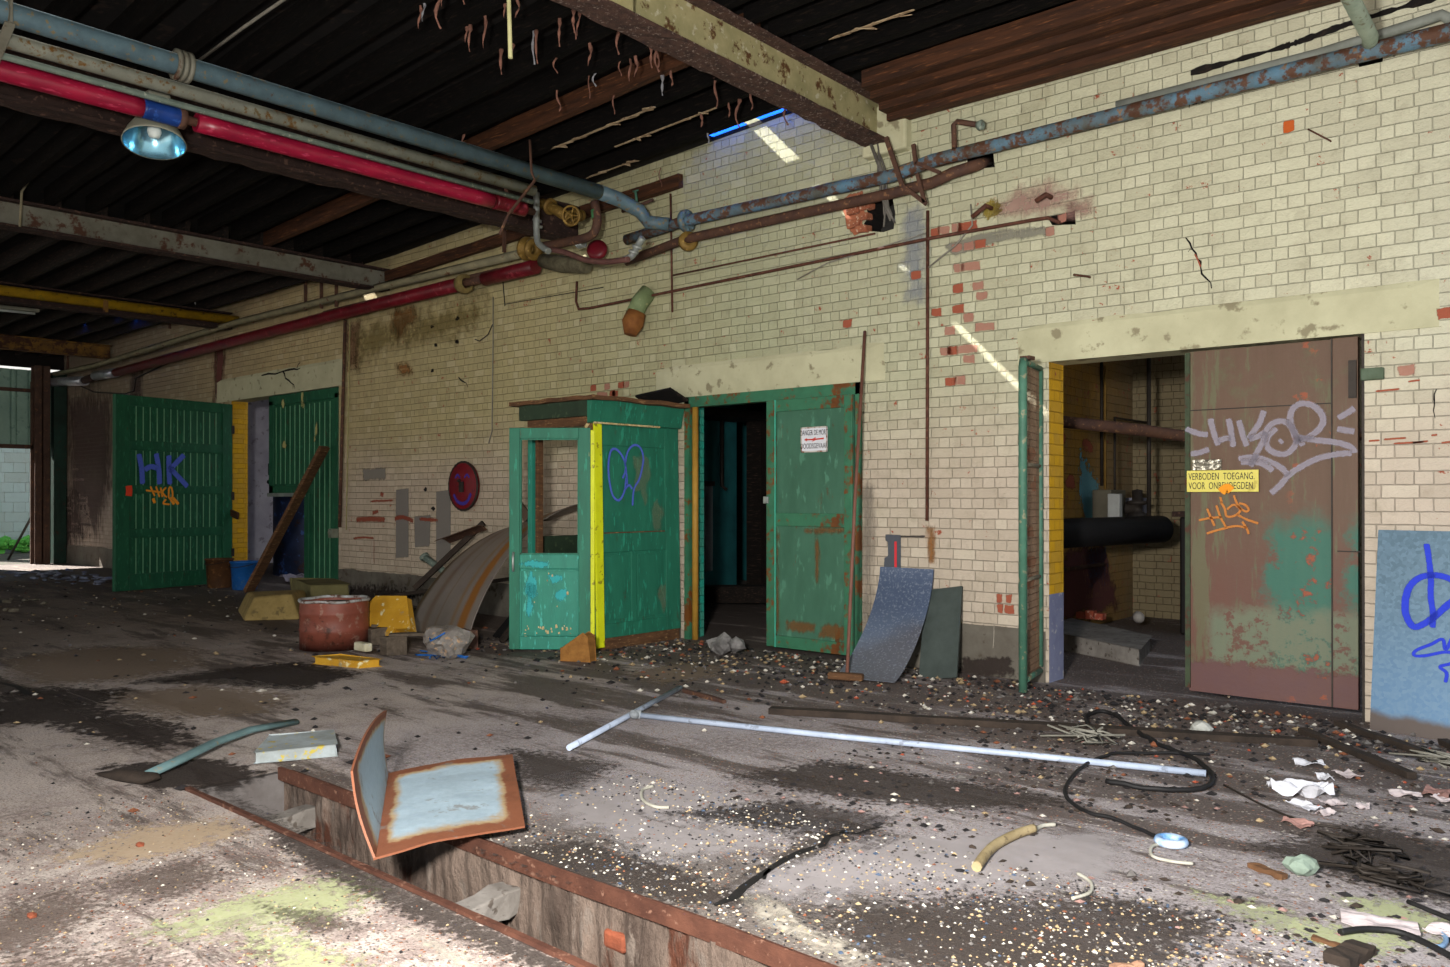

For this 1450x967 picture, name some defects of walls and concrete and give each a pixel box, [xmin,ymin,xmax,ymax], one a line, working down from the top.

spalling [843,191,875,236]
crack [1186,238,1212,288]
peeling [930,220,994,386]
water stain [355,305,479,363]
rust [801,426,827,453]
peeling [996,556,1035,614]
water stain [0,646,309,720]
peeling [467,624,1450,823]